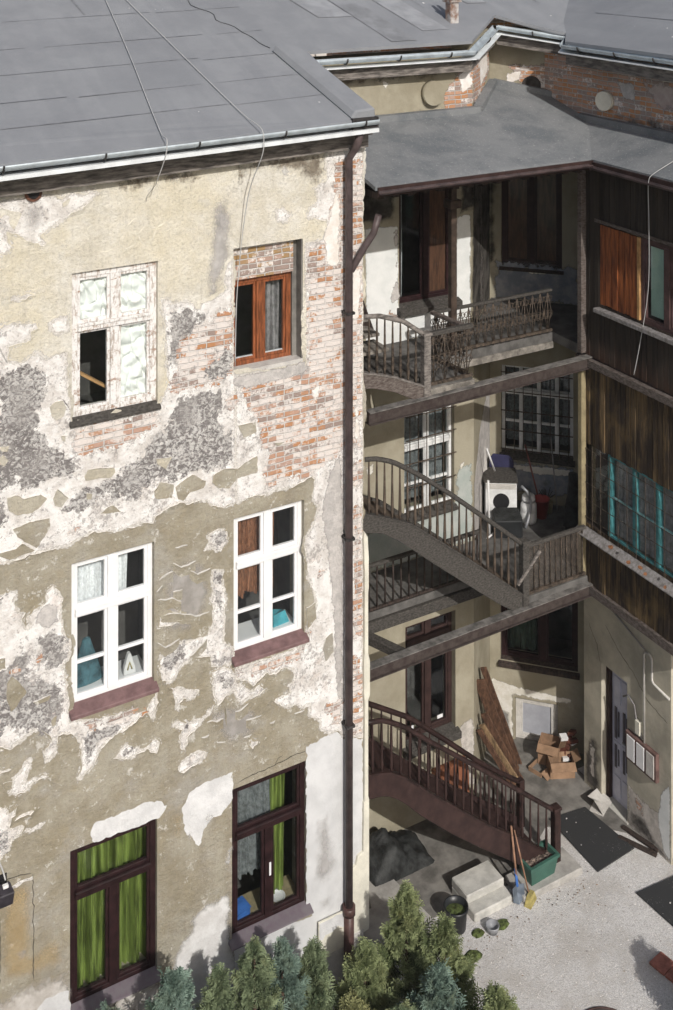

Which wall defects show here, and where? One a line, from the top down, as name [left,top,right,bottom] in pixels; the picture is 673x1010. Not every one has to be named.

crack [188,0,270,48]
flaking render [444,52,489,108]
flaking render [507,63,545,89]
flaking render [0,148,421,860]